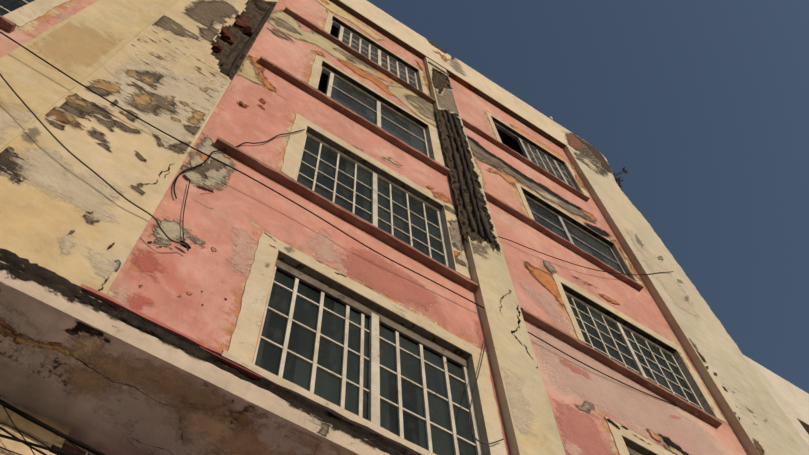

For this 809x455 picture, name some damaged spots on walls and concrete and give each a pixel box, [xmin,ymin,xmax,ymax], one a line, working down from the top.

spalling [0,0,612,268]
spalling [0,317,136,385]
leakage [0,260,216,361]
crack [70,353,178,408]
crack [499,293,545,360]
spalling [177,397,266,455]
spalling [647,428,691,455]